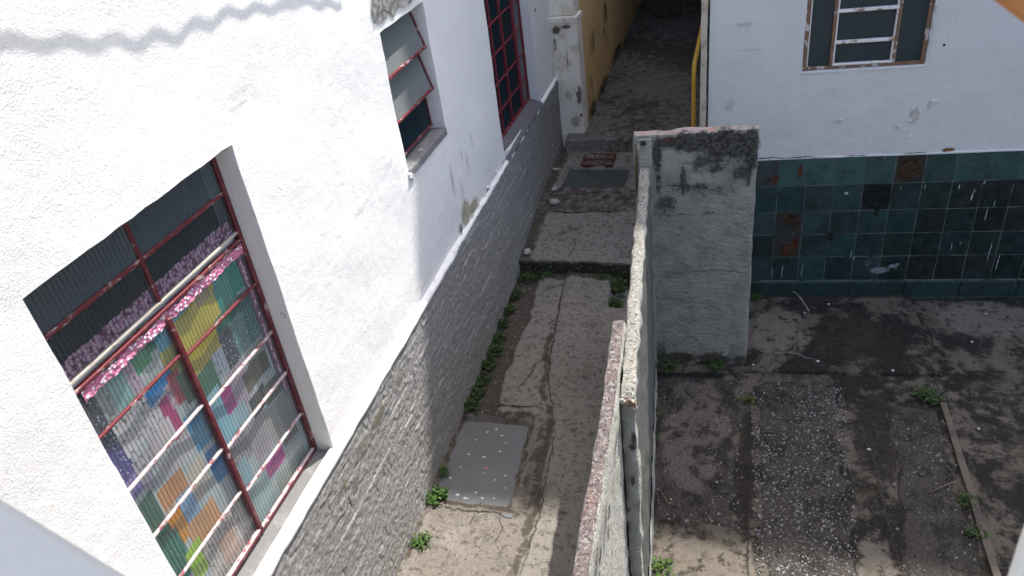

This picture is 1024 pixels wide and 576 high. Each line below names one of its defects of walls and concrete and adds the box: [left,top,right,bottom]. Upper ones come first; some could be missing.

water stain [653,126,760,217]
crack [440,283,564,575]